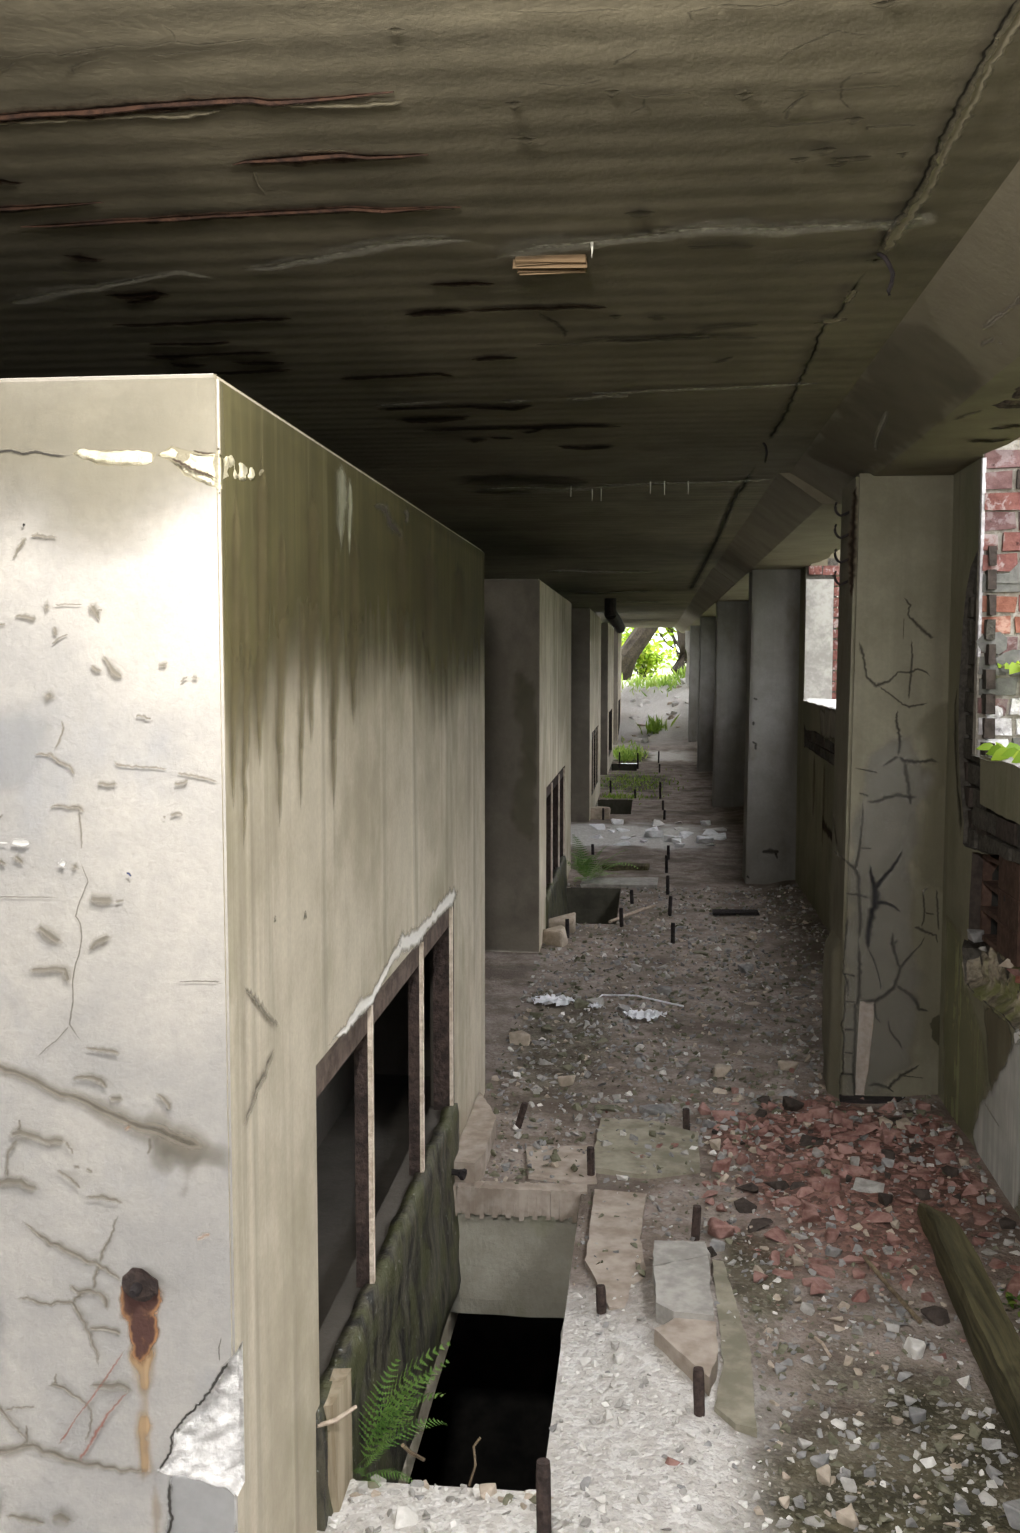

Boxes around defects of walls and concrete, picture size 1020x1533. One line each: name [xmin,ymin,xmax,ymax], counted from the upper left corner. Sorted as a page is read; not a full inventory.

crack [0,449,63,457]
spalling [75,448,264,493]
spalling [991,387,1020,409]
flaking render [963,546,1020,864]
crack [822,599,962,1095]
crack [0,722,215,1154]
crack [21,1217,121,1362]
corrosion [61,1286,162,1459]
crack [0,1340,228,1533]
corrosion [138,1415,150,1473]
spalling [159,1348,242,1483]